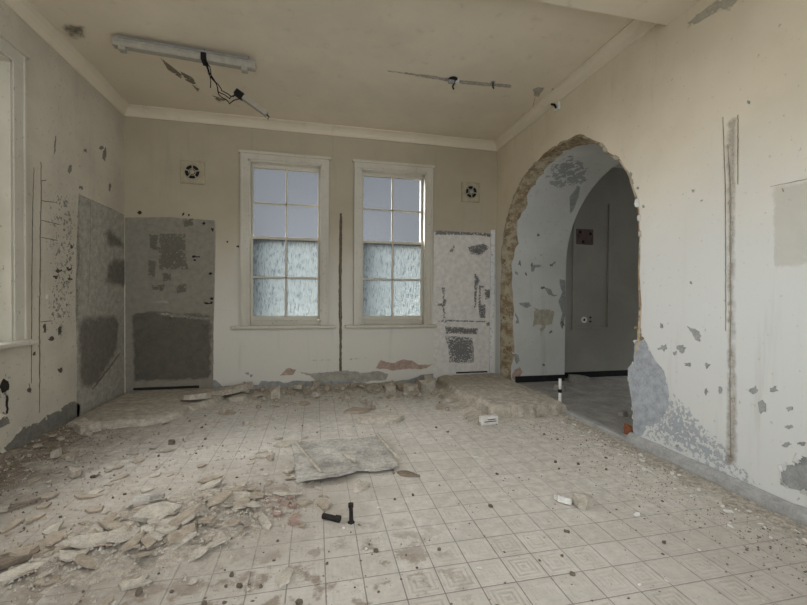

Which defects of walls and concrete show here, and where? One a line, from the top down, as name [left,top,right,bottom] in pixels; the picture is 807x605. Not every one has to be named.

peeling [687,0,737,29]
flaking render [0,184,233,454]
flaking render [243,232,490,389]
flaking render [500,134,760,485]
peeling [749,386,766,414]
peeling [777,442,807,495]